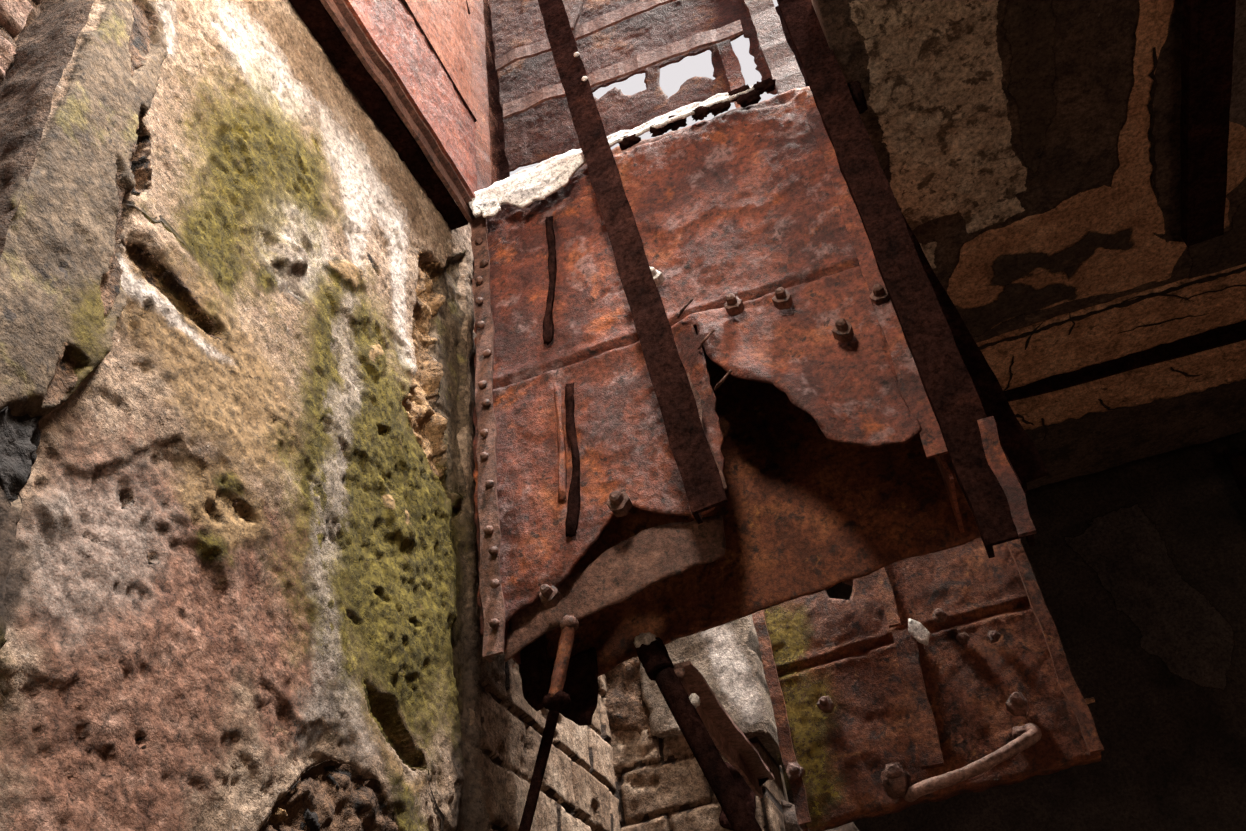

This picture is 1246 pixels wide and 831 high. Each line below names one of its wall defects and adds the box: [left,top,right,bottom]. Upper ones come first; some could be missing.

flaking render [0,0,168,516]
damp [162,2,174,51]
damp [214,0,415,368]
peeling [849,0,1187,337]
flaking render [1224,121,1246,228]
spalling [364,250,490,831]
spalling [259,725,400,831]